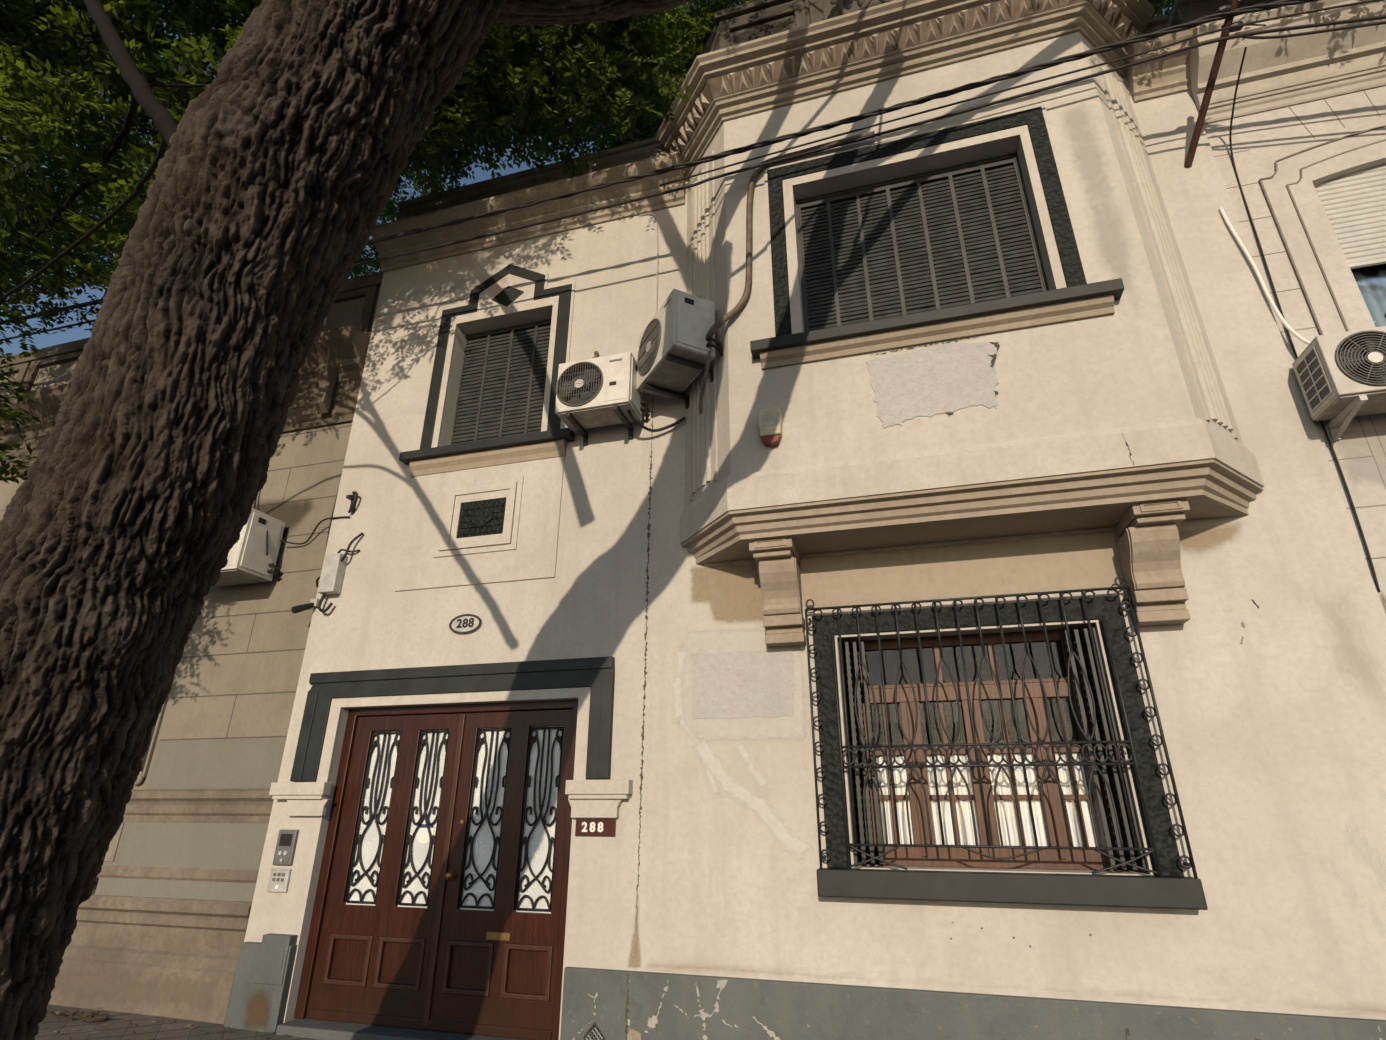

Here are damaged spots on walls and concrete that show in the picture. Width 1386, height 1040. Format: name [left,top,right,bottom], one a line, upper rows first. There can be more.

crack [635,397,654,928]
spalling [627,1019,641,1040]